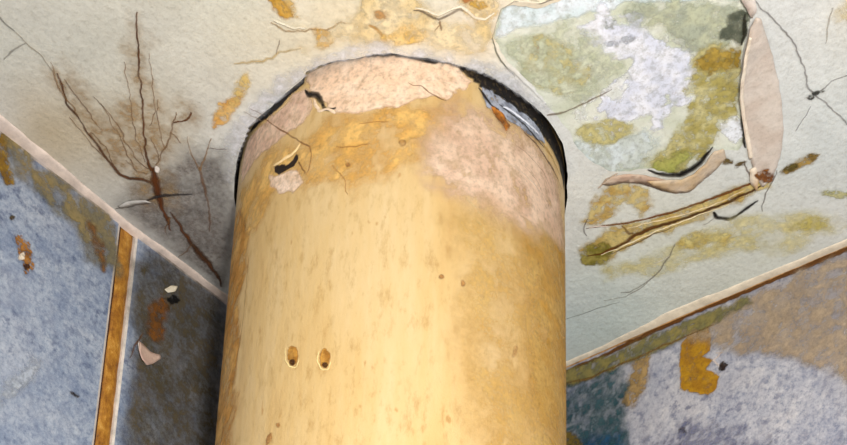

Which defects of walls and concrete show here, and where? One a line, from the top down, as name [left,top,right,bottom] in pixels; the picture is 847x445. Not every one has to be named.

rust [268,0,294,18]
water stain [271,0,492,54]
crack [757,3,847,130]
crack [0,12,222,287]
peeling [242,56,559,181]
peeling [492,0,784,205]
rust [15,235,34,274]
water stain [581,213,831,275]
water stain [684,258,847,380]
peeling [138,341,161,365]
rust [679,327,728,394]